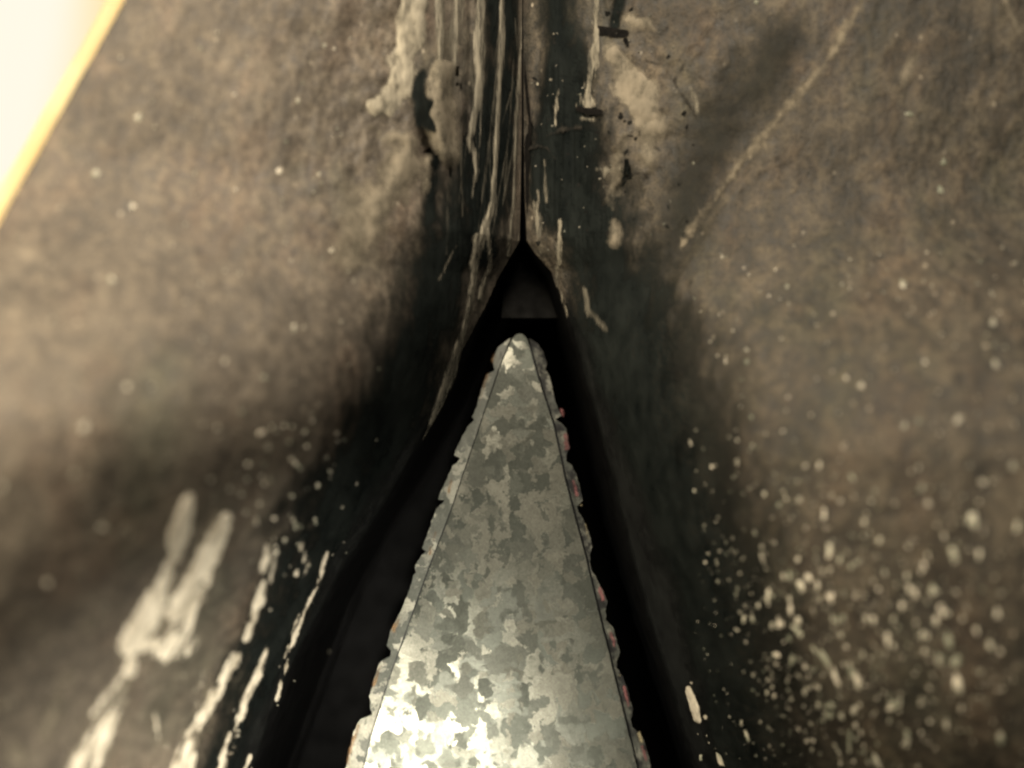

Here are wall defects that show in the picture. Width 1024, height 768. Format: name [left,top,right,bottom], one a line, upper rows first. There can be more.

leakage [204,0,522,768]
leakage [529,0,819,768]